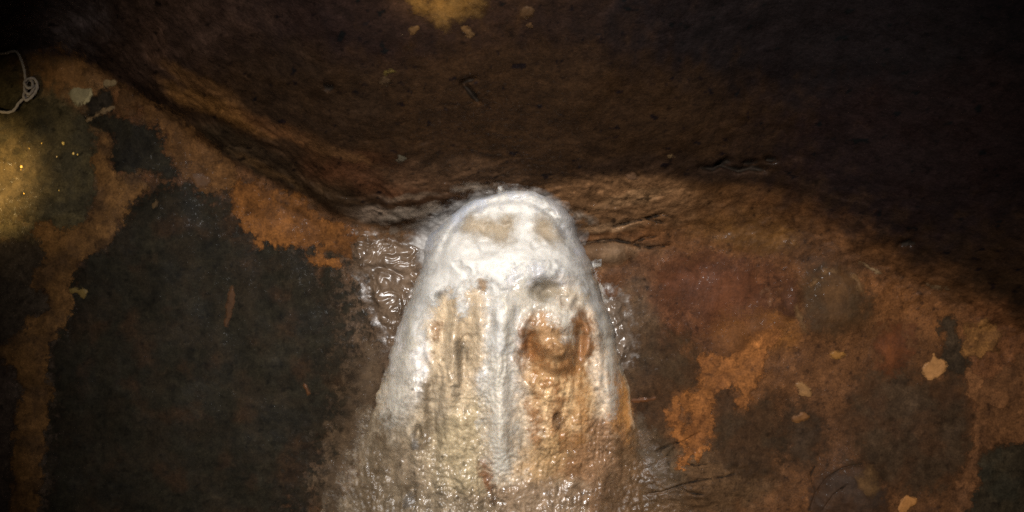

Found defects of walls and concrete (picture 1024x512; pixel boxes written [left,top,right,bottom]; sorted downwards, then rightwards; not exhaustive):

leakage [316,184,667,512]